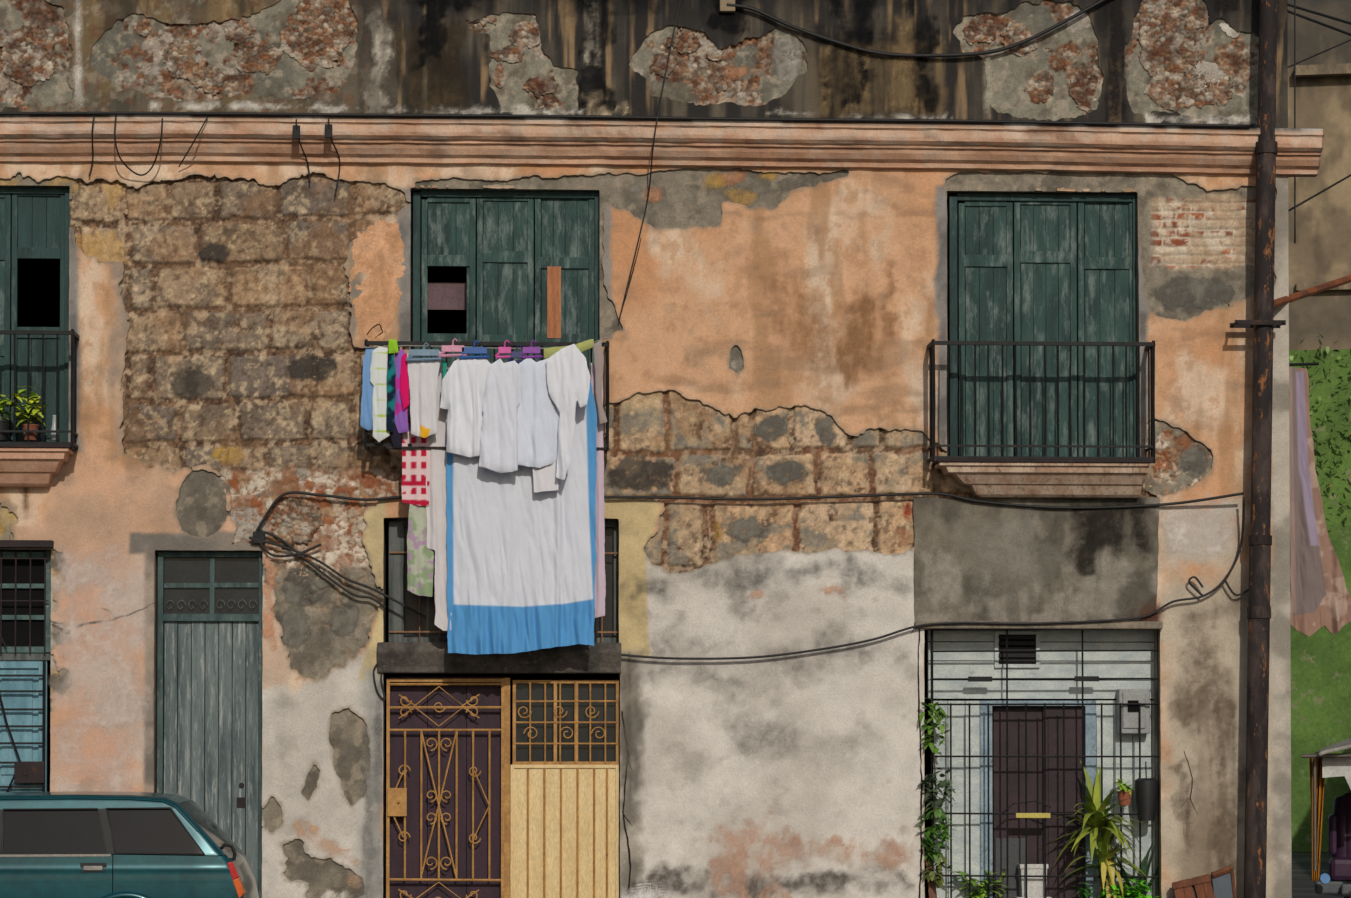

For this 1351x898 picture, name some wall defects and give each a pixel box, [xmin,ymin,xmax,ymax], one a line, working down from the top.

damp [185,101,280,110]
spalling [629,25,808,106]
damp [707,0,746,33]
damp [820,0,946,119]
spalling [953,0,1104,121]
spalling [1124,0,1259,120]
damp [1192,115,1257,124]
spalling [944,171,1256,321]
spalling [0,167,848,680]
spalling [603,390,977,573]
damp [622,866,687,898]
damp [739,872,848,898]